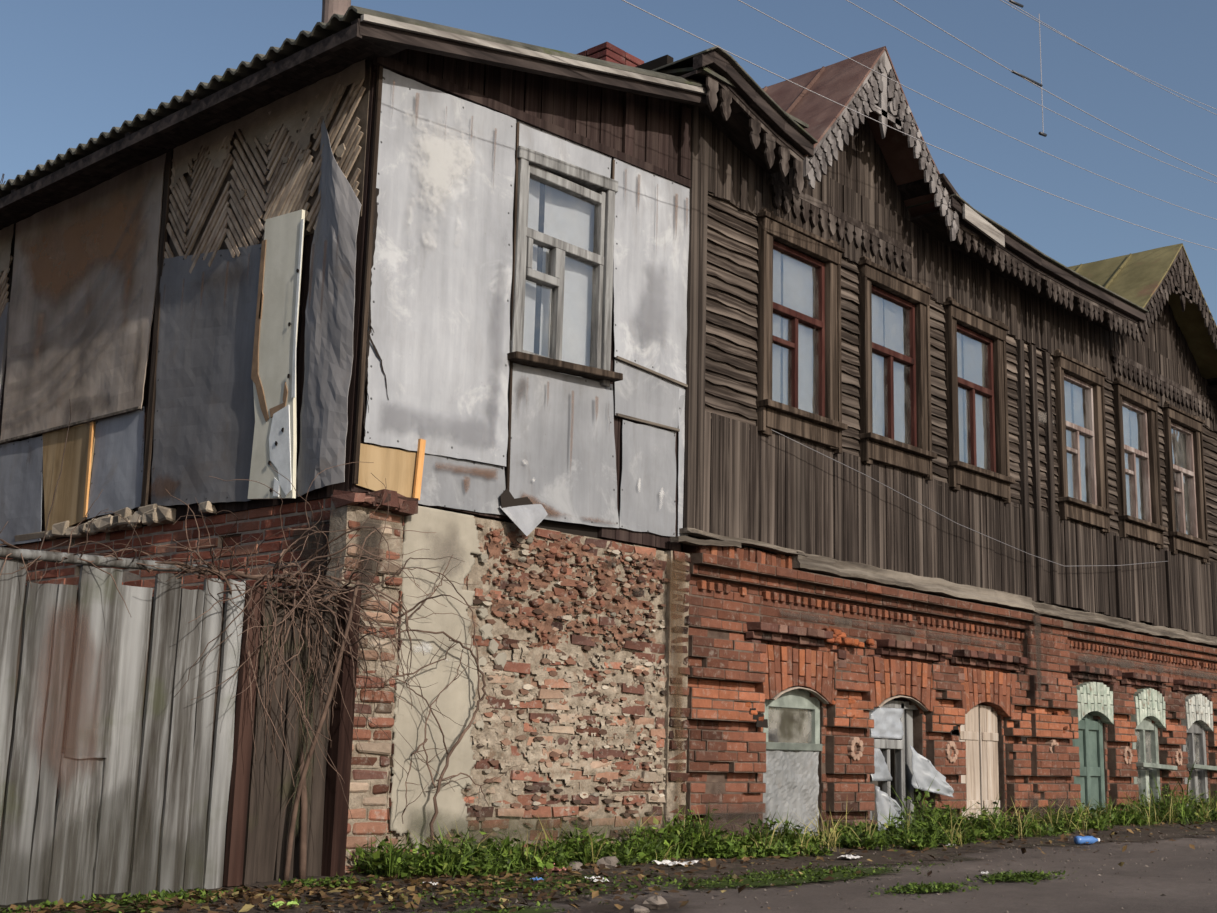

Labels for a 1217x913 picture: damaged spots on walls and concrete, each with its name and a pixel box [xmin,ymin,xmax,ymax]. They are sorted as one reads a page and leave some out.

water stain [26,190,142,298]
peeling [388,506,670,853]